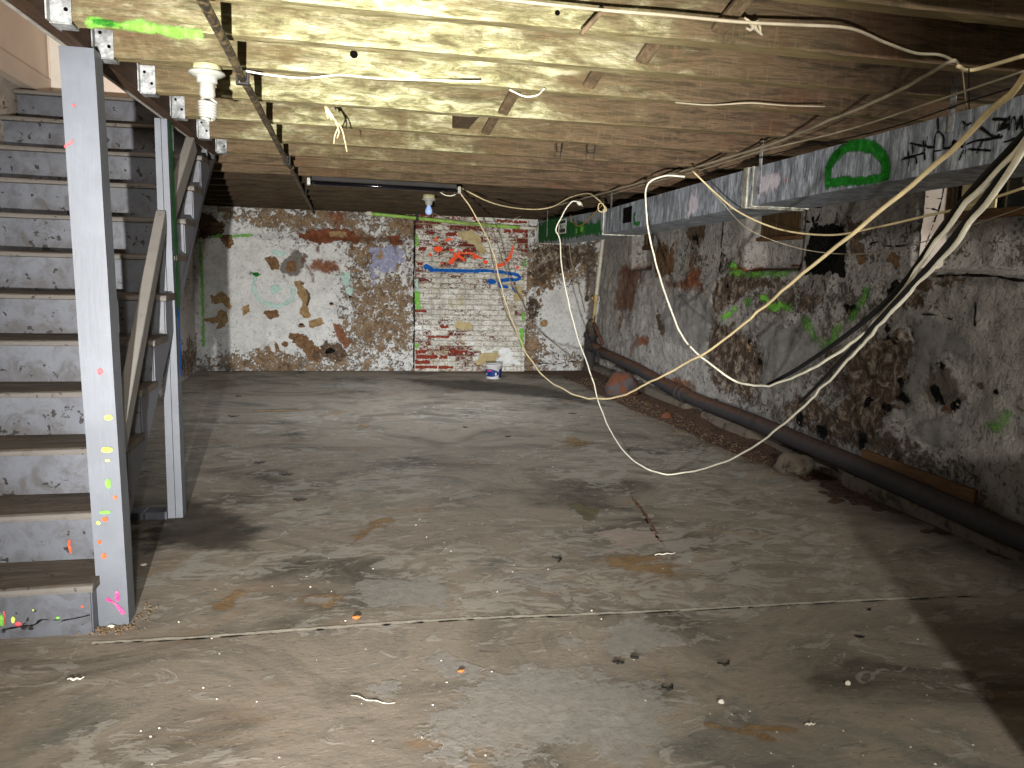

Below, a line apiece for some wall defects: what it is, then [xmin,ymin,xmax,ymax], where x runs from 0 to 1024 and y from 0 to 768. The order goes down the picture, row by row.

peeling [198,212,234,250]
peeling [245,210,400,230]
spalling [685,225,705,249]
spalling [652,240,675,279]
peeling [204,291,250,329]
peeling [247,250,468,370]
peeling [526,297,548,327]
spalling [705,267,824,401]
spalling [778,323,967,451]
crack [630,496,664,542]
crack [5,615,90,630]
crack [91,596,968,645]